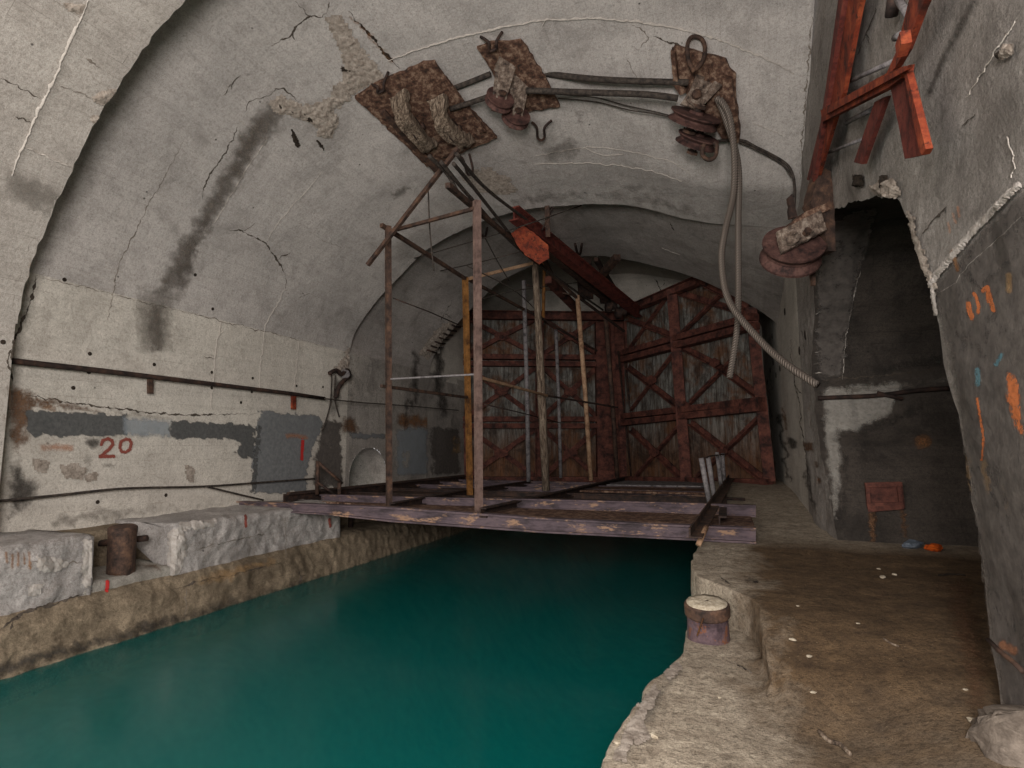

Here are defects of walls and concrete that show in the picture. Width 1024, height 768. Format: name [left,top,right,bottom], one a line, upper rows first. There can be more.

crack [1,78,89,122]
crack [202,76,296,198]
spalling [268,15,383,151]
crack [272,1,399,68]
crack [962,18,1017,126]
crack [6,141,326,416]
damp [141,111,277,350]
peeling [25,398,460,494]
peeling [906,193,1024,706]